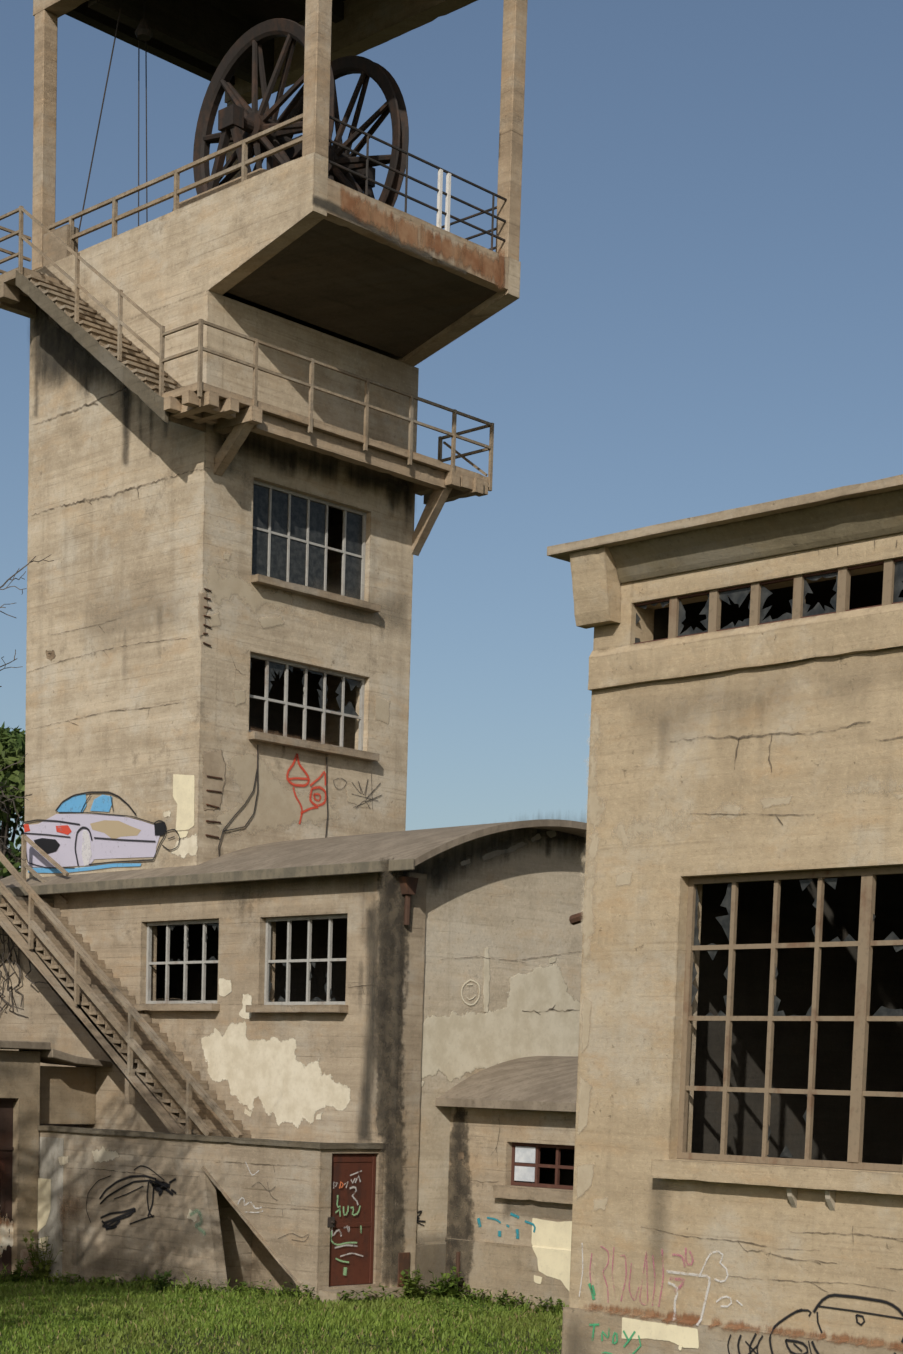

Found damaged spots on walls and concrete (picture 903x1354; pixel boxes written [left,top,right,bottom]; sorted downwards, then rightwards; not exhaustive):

corrosion [341,188,505,287]
damp [34,304,131,460]
peeling [582,714,605,961]
peeling [201,978,351,1129]
damp [359,828,586,1291]
peeling [421,947,591,1087]
peeling [578,1078,591,1133]
peeling [0,1214,48,1279]
peeling [577,1164,608,1210]